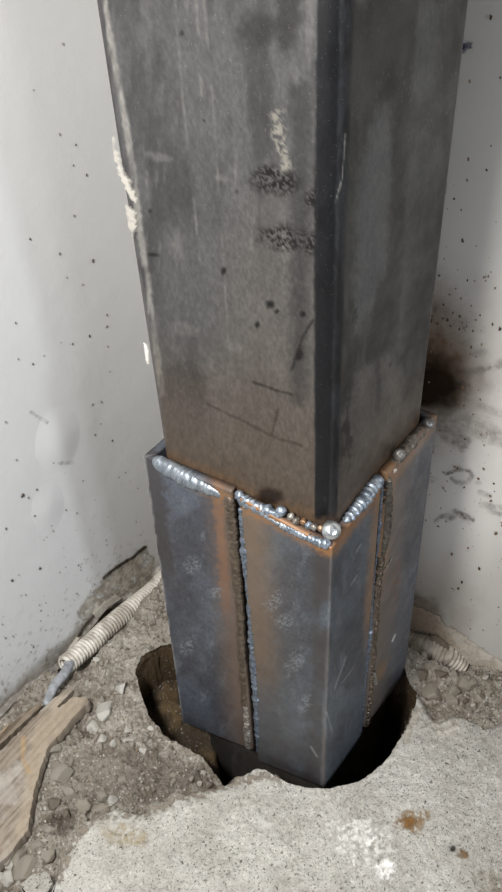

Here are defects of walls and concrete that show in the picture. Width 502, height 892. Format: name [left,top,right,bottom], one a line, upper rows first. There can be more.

flaking render [68,546,154,649]
peeling [410,605,502,671]
spalling [402,709,422,744]
spalling [56,772,282,883]
corrosion [397,811,429,833]